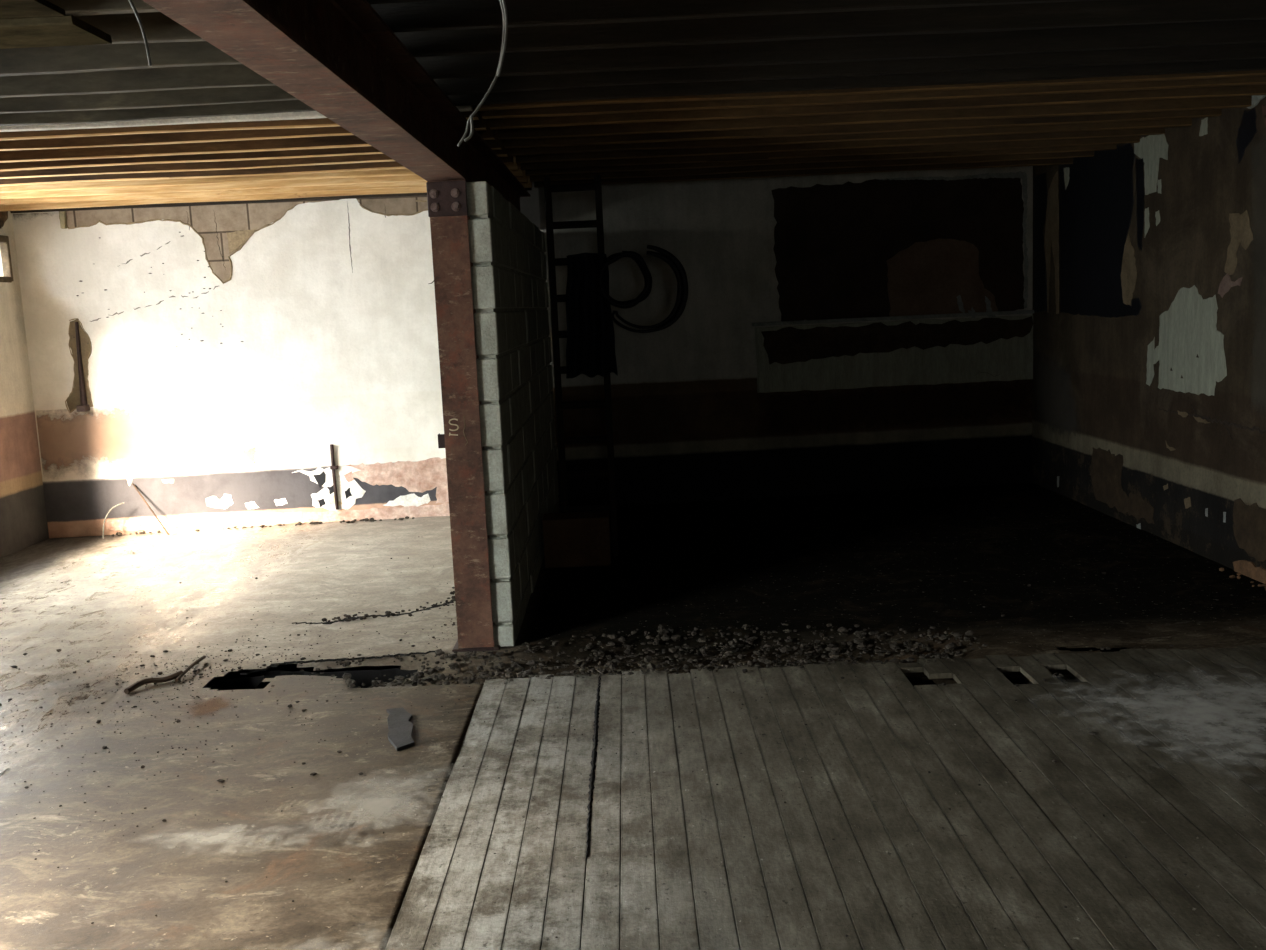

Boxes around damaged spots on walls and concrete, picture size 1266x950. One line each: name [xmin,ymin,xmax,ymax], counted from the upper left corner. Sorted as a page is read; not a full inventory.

peeling [1199,117,1208,136]
spalling [1236,108,1258,163]
peeling [1134,134,1168,236]
flaking render [59,199,340,289]
peeling [1146,210,1253,396]
flaking render [65,318,93,413]
flaking render [106,457,450,536]
peeling [1089,447,1155,529]
peeling [1219,498,1266,590]